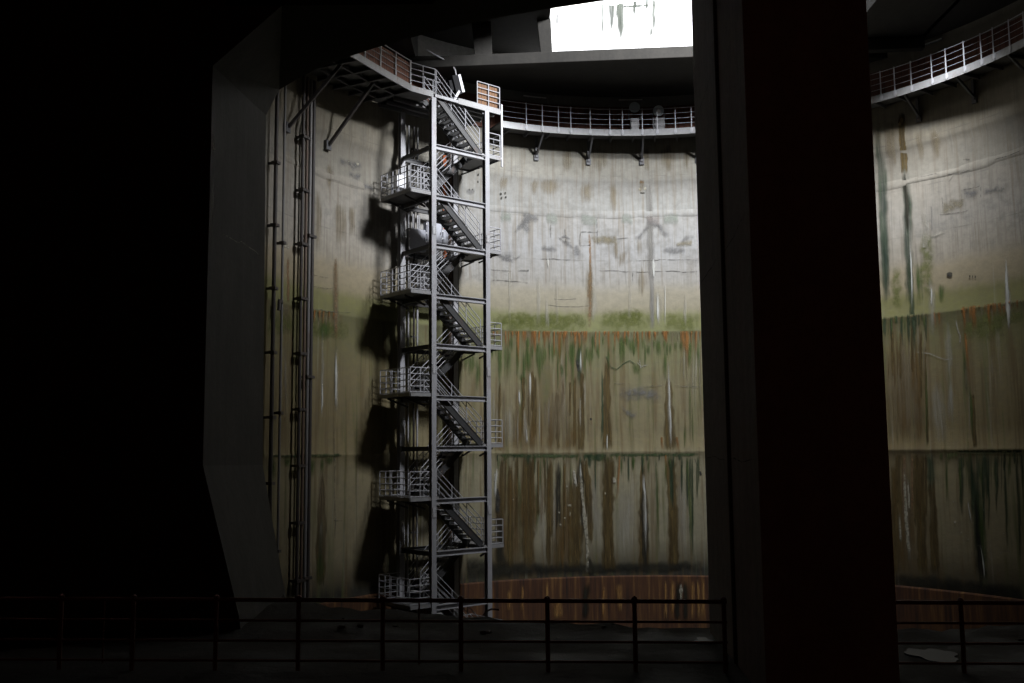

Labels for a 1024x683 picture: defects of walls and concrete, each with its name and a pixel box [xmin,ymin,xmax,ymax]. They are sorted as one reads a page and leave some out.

leakage [898,114,908,172]
leakage [877,148,888,291]
leakage [467,362,691,576]
leakage [891,456,1018,597]